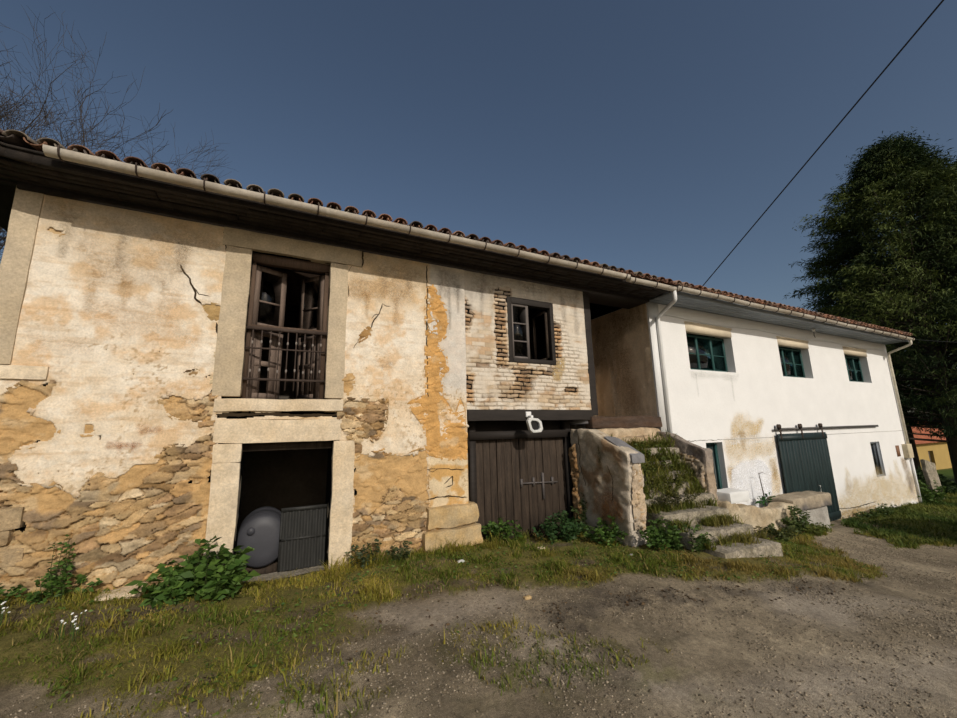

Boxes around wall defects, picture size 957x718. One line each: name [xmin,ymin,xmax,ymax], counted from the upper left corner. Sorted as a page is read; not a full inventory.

crack [180,264,208,304]
spalling [494,288,553,400]
spalling [554,325,563,361]
flaking render [0,375,219,594]
flaking render [336,284,475,563]
water stain [729,422,779,499]